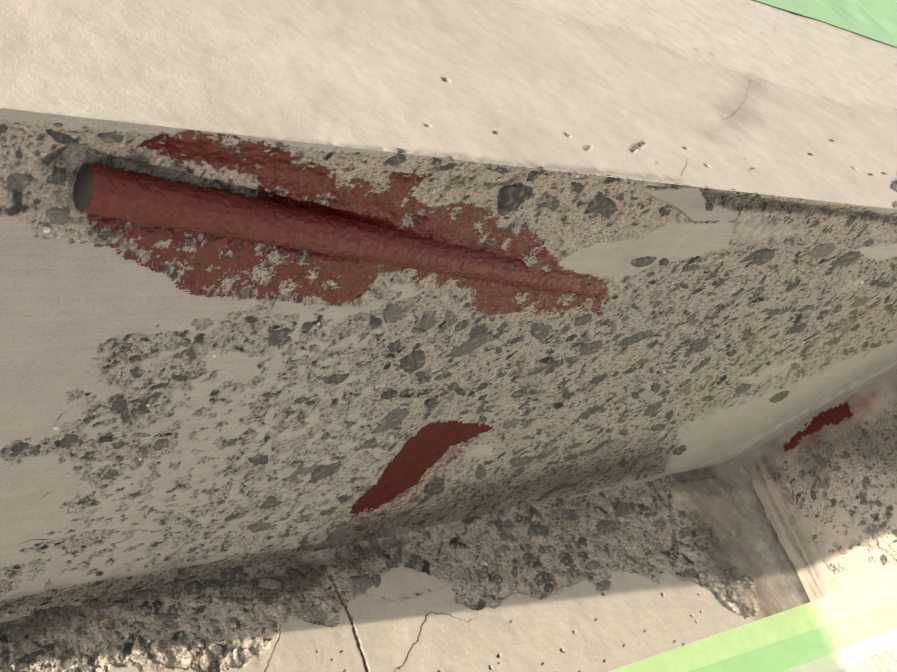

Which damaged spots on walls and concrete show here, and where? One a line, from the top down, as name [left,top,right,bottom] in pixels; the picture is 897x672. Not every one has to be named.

spalling [0,120,694,307]
spalling [0,186,897,672]
crack [264,617,339,672]
crack [394,611,478,672]